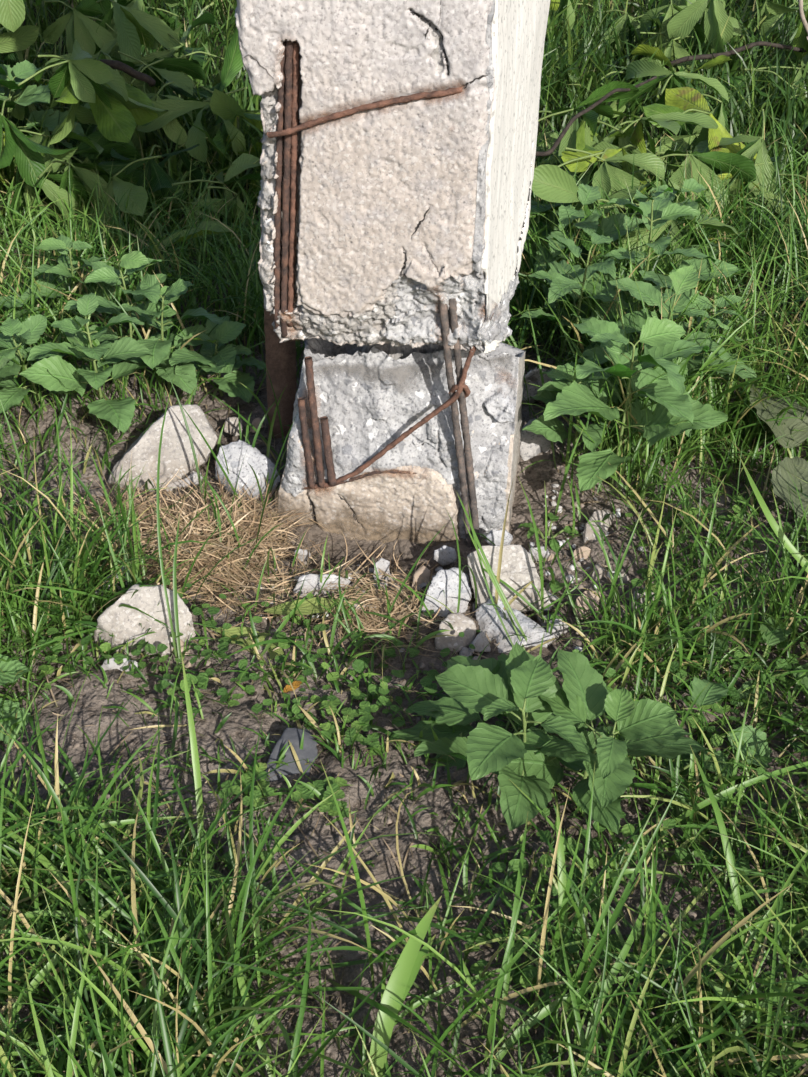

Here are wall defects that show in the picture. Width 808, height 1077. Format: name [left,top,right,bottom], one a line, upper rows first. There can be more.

crack [410,2,494,88]
spalling [260,0,519,548]
crack [400,205,446,280]